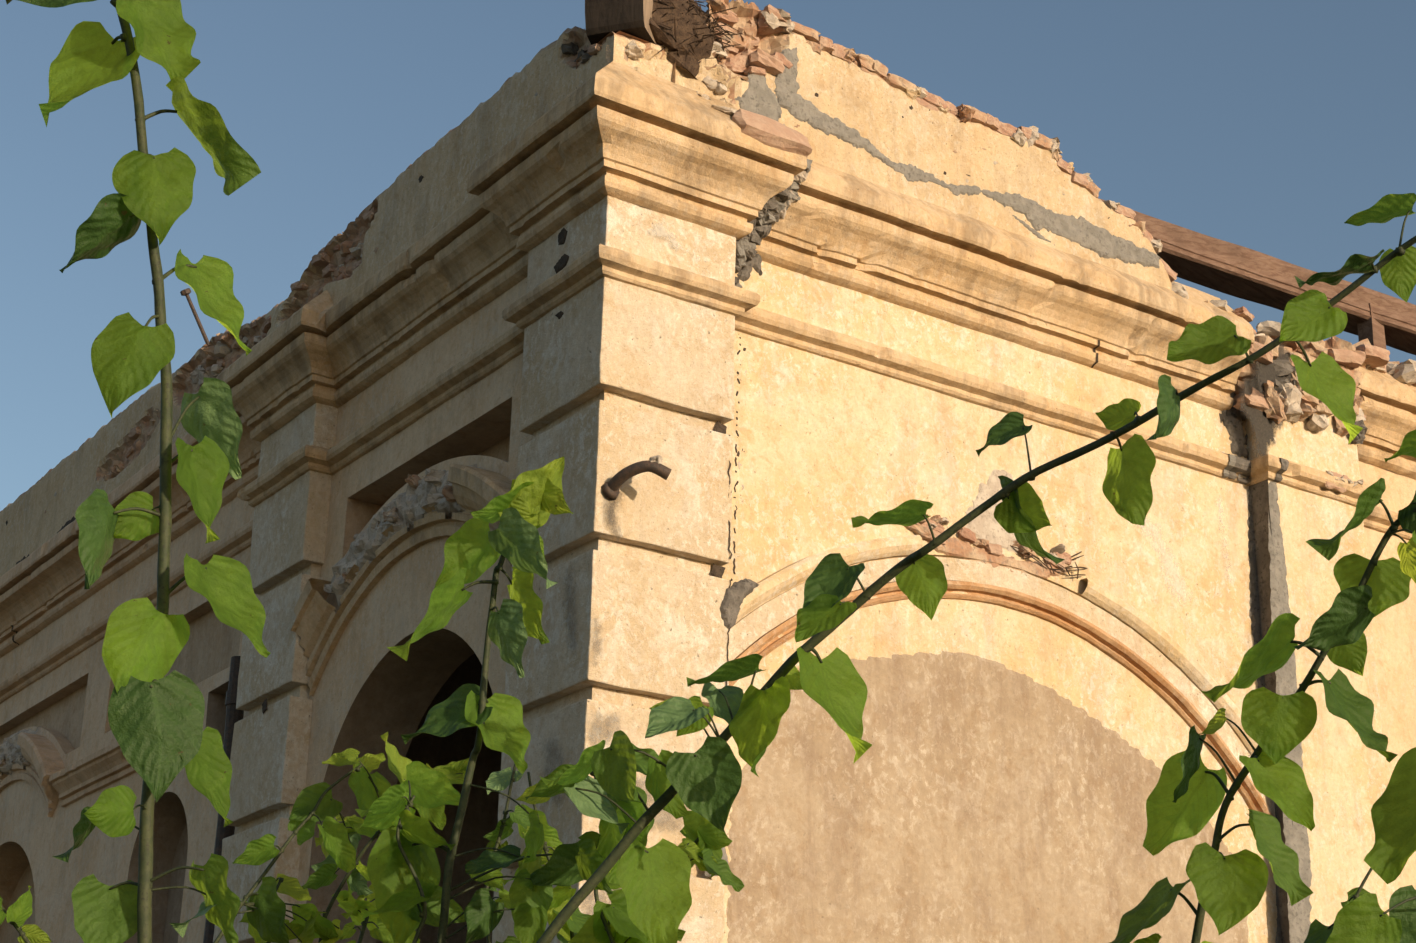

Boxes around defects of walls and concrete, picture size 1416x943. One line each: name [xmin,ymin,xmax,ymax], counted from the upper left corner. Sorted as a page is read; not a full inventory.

flaking render [560,28,606,67]
flaking render [625,0,813,288]
crack [735,47,1161,268]
spalling [291,207,378,313]
spalling [99,410,160,481]
spalling [175,315,271,397]
peeling [1261,359,1368,444]
spalling [323,469,466,607]
spalling [905,469,1087,579]
spalling [0,726,43,782]